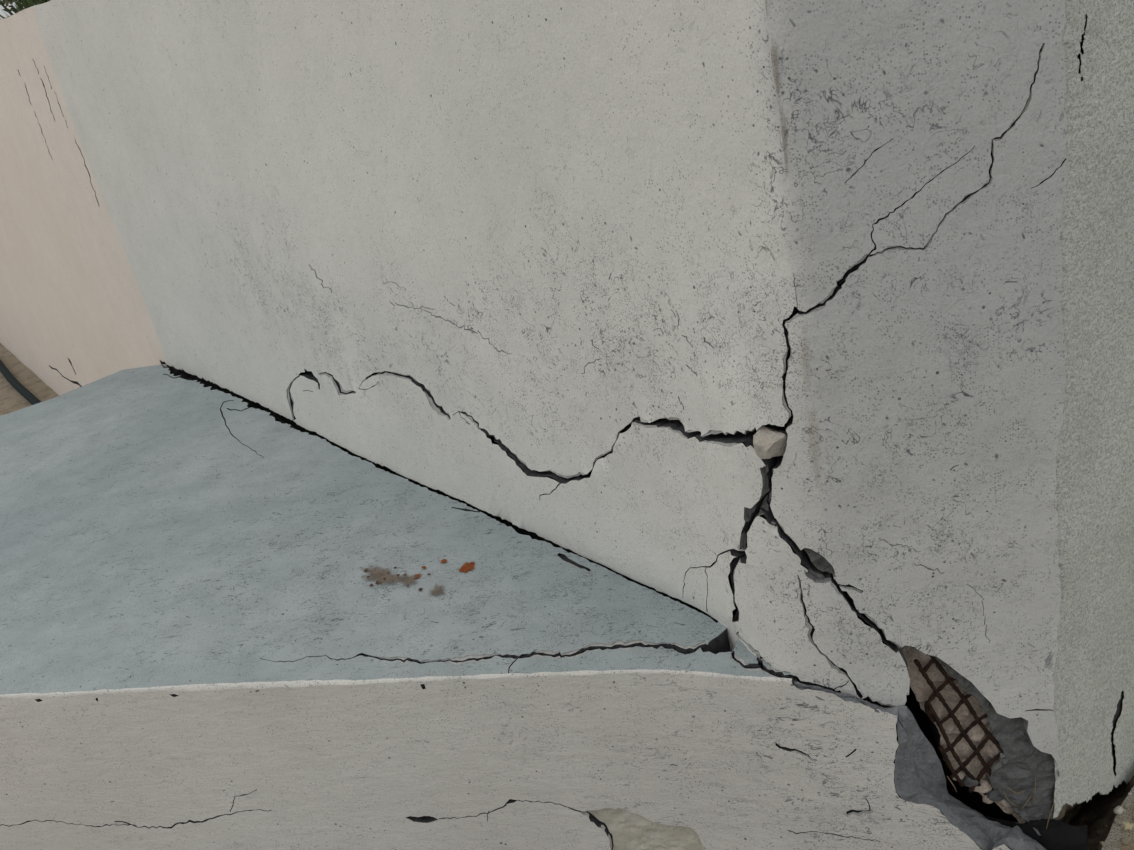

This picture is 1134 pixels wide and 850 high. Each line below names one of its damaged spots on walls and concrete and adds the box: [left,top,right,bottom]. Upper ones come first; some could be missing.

crack [18,59,99,205]
crack [1030,158,1066,189]
crack [160,43,1045,708]
corrosion [364,566,444,595]
corrosion [459,561,475,573]
spalling [881,637,1060,836]
crack [1111,691,1123,756]
crack [0,789,271,829]
crack [439,804,507,821]
peeling [504,799,705,850]